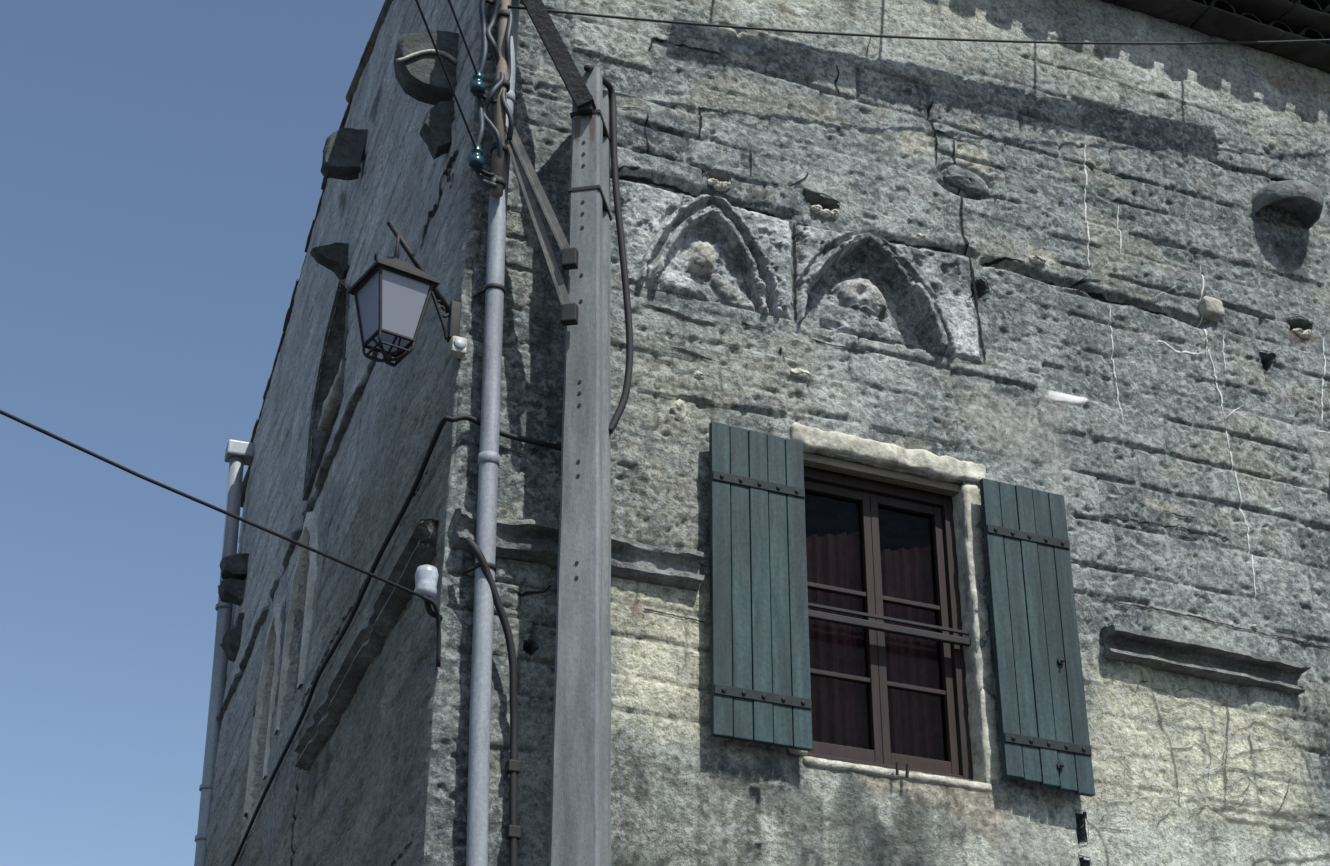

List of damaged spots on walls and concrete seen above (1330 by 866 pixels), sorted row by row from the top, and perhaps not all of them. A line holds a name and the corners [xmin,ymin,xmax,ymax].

crack [888,101,1181,364]
crack [290,755,301,866]